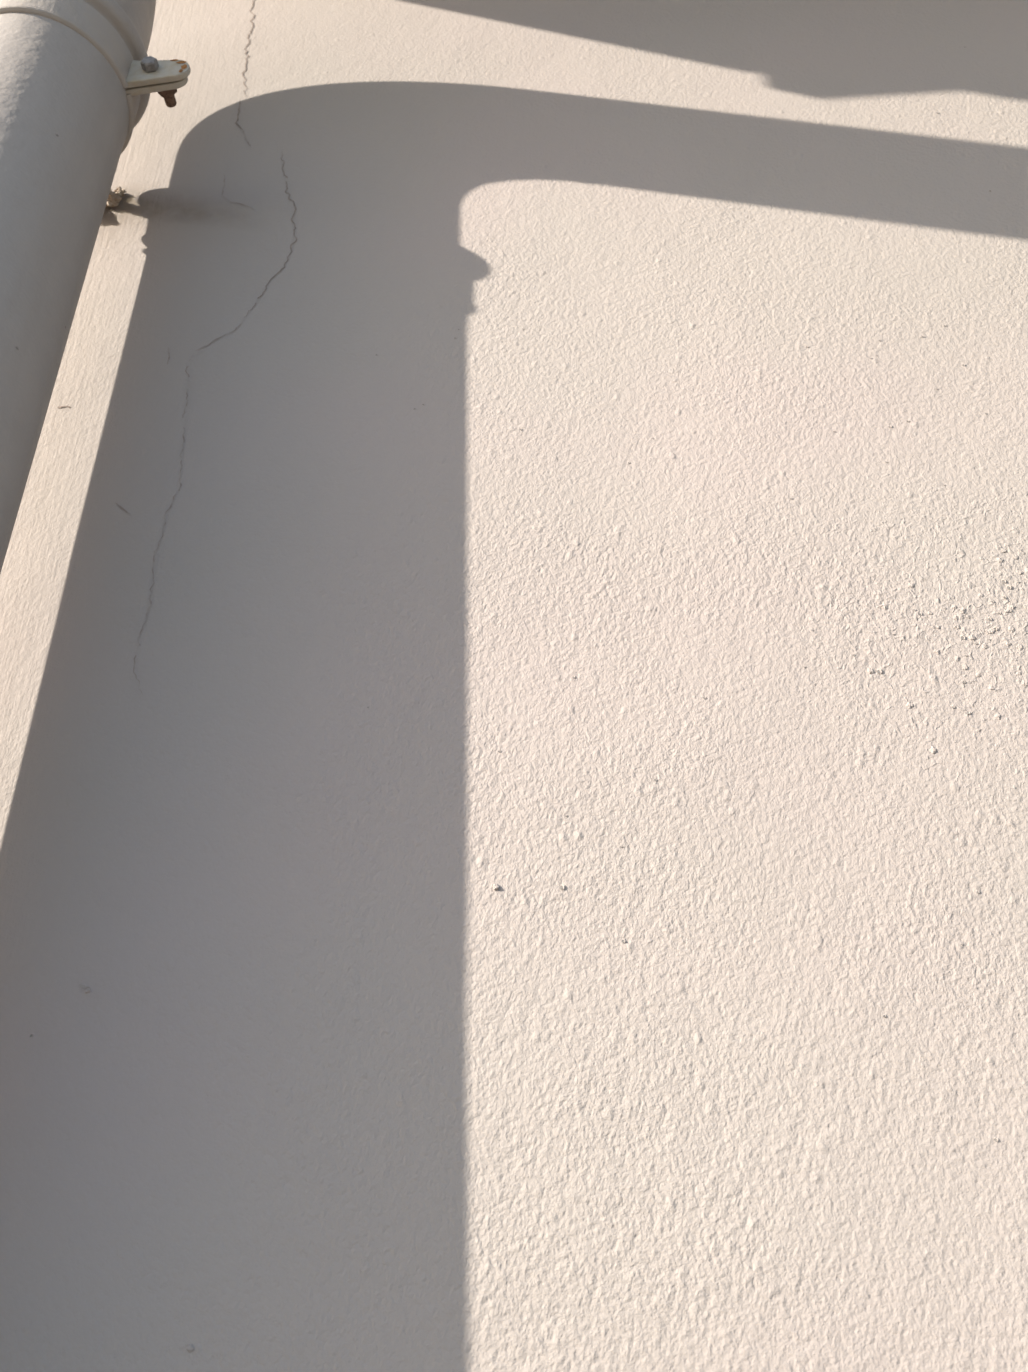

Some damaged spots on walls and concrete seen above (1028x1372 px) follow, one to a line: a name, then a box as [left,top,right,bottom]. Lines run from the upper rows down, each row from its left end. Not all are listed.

crack [133,0,297,693]